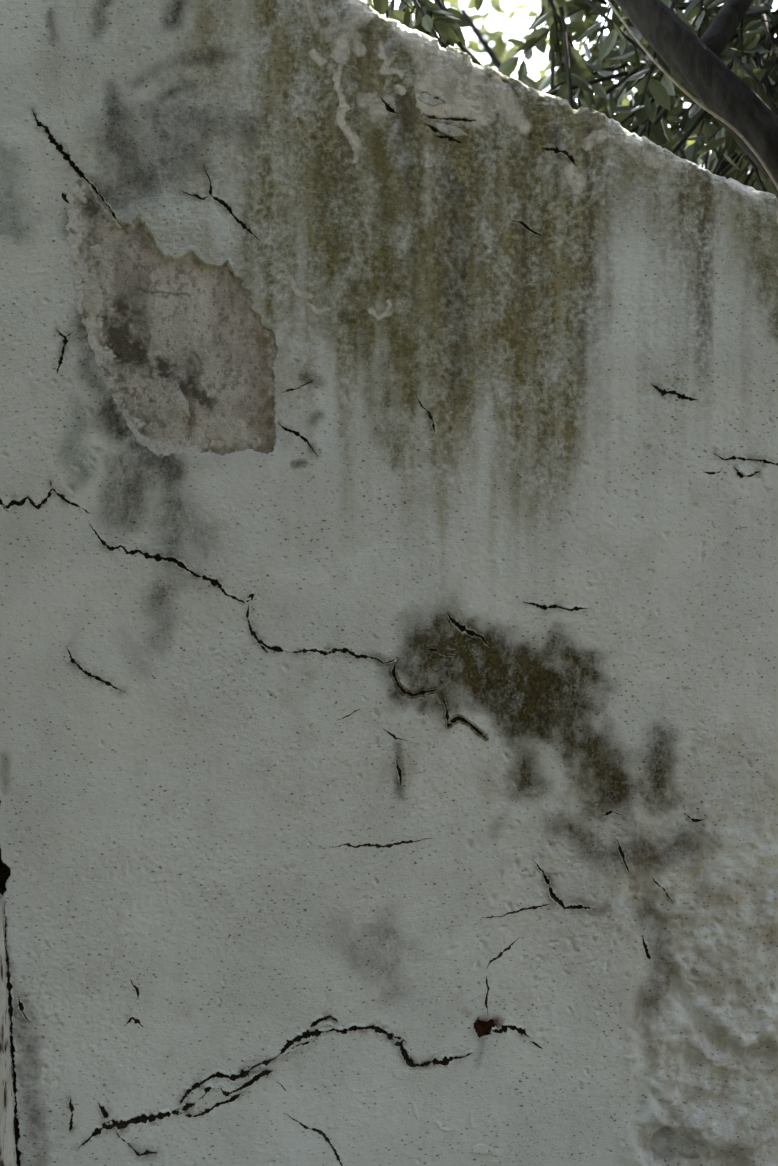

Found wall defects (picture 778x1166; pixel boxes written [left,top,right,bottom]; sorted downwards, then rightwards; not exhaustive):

crack [29,110,124,228]
crack [181,166,260,241]
leakage [301,0,535,408]
peeling [435,123,467,138]
leakage [564,163,587,196]
leakage [582,129,678,172]
leakage [724,178,761,202]
spalling [62,177,278,458]
crack [0,481,492,742]
leakage [470,635,561,744]
crack [2,903,32,1166]
crack [66,858,596,1166]